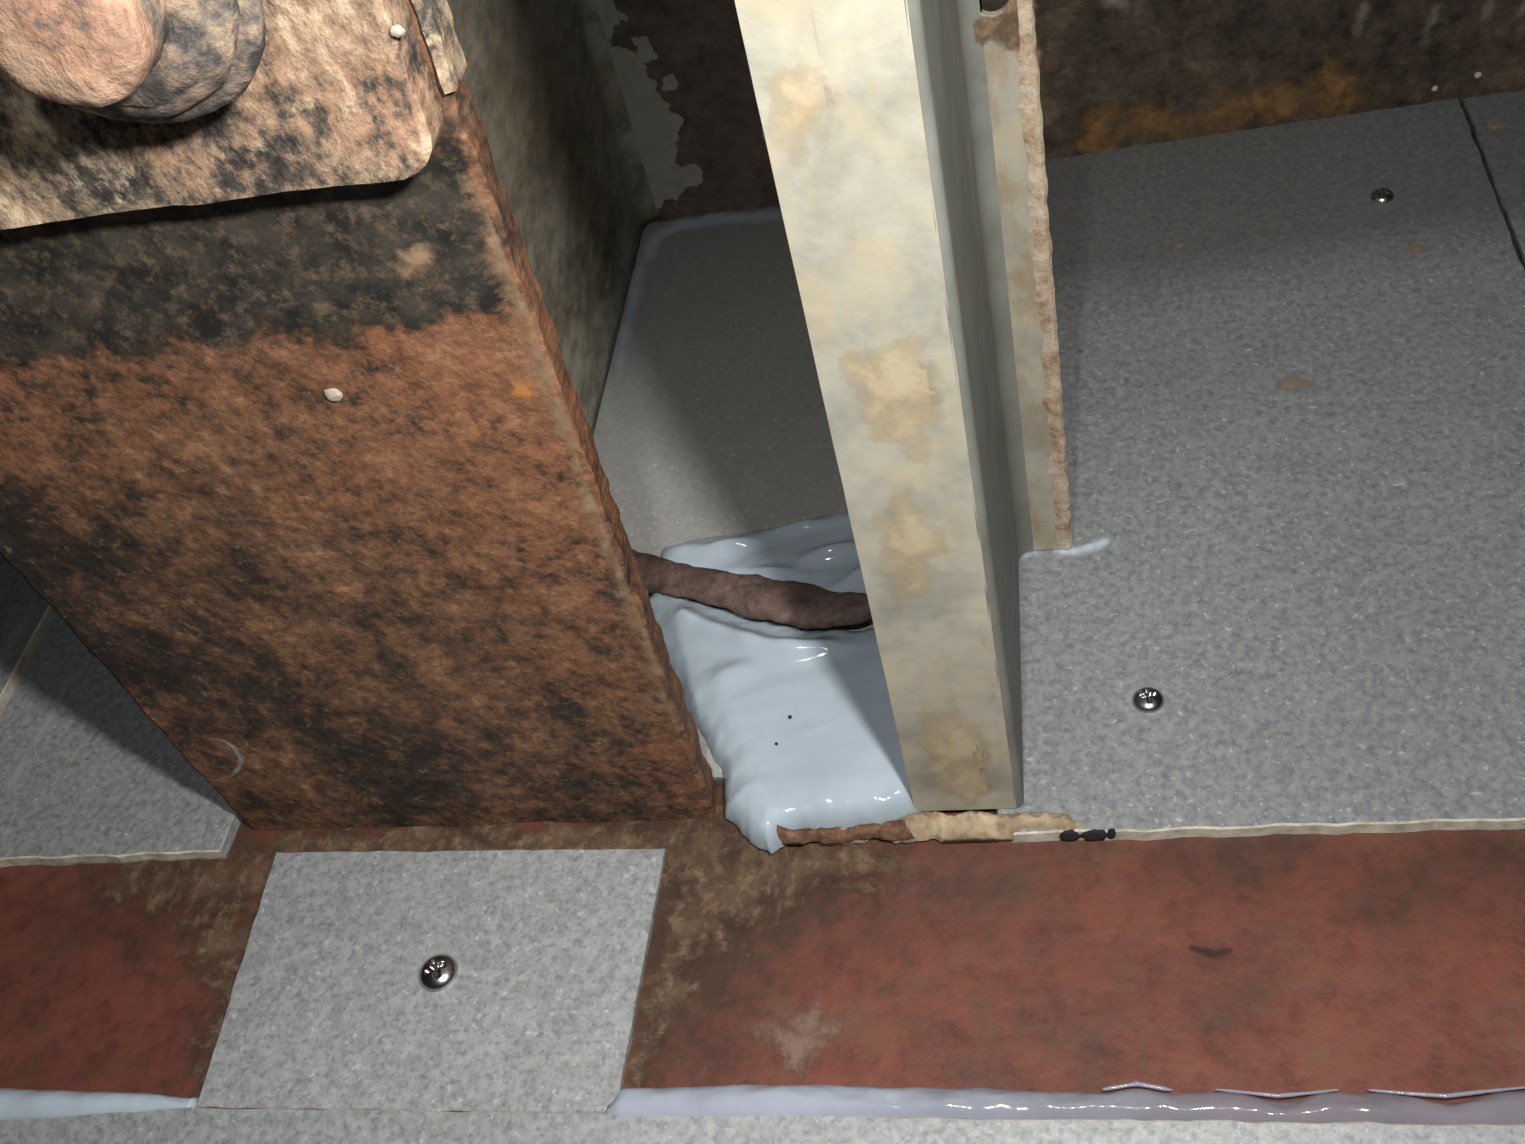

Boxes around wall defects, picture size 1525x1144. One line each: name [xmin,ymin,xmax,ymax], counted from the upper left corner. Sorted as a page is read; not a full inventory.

rust [411,0,467,94]
peeling [595,0,703,210]
rust [397,244,431,277]
rust [973,0,1072,550]
rust [466,183,872,723]